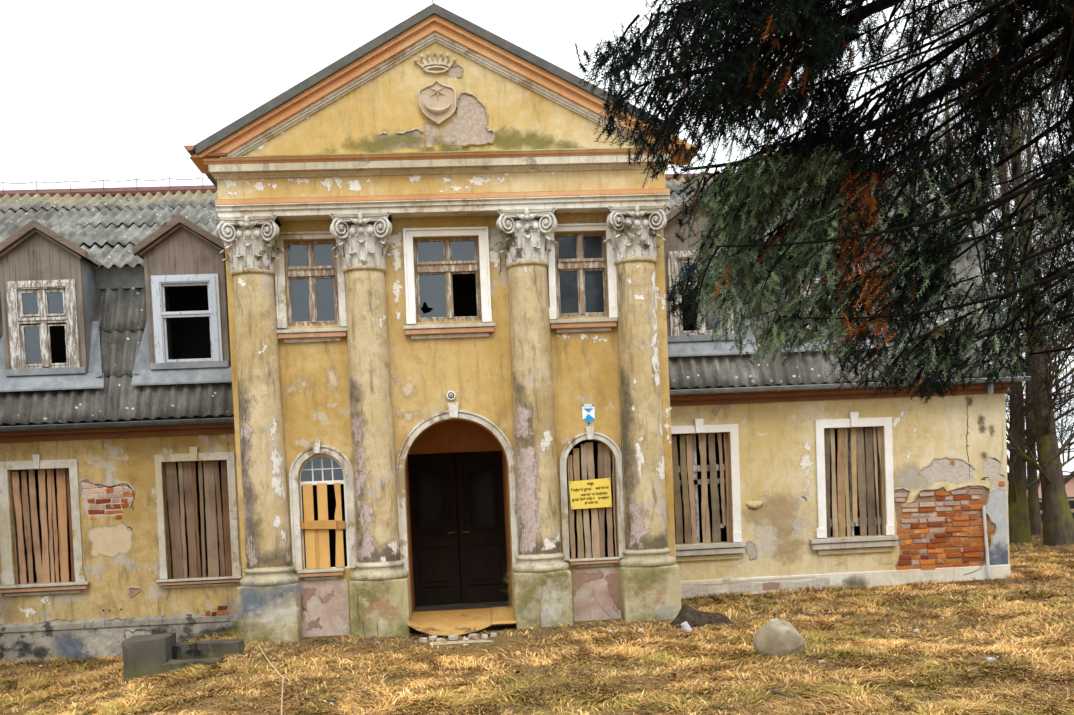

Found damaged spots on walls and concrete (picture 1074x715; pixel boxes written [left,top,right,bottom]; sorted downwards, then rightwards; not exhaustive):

spalling [377,91,496,150]
damp [494,132,576,150]
peeling [222,177,371,196]
peeling [440,173,510,193]
flaking render [79,478,135,520]
peeling [513,401,561,555]
flaking render [894,448,1006,575]
flaking render [300,587,334,631]
damp [0,641,48,661]
damp [59,634,113,659]